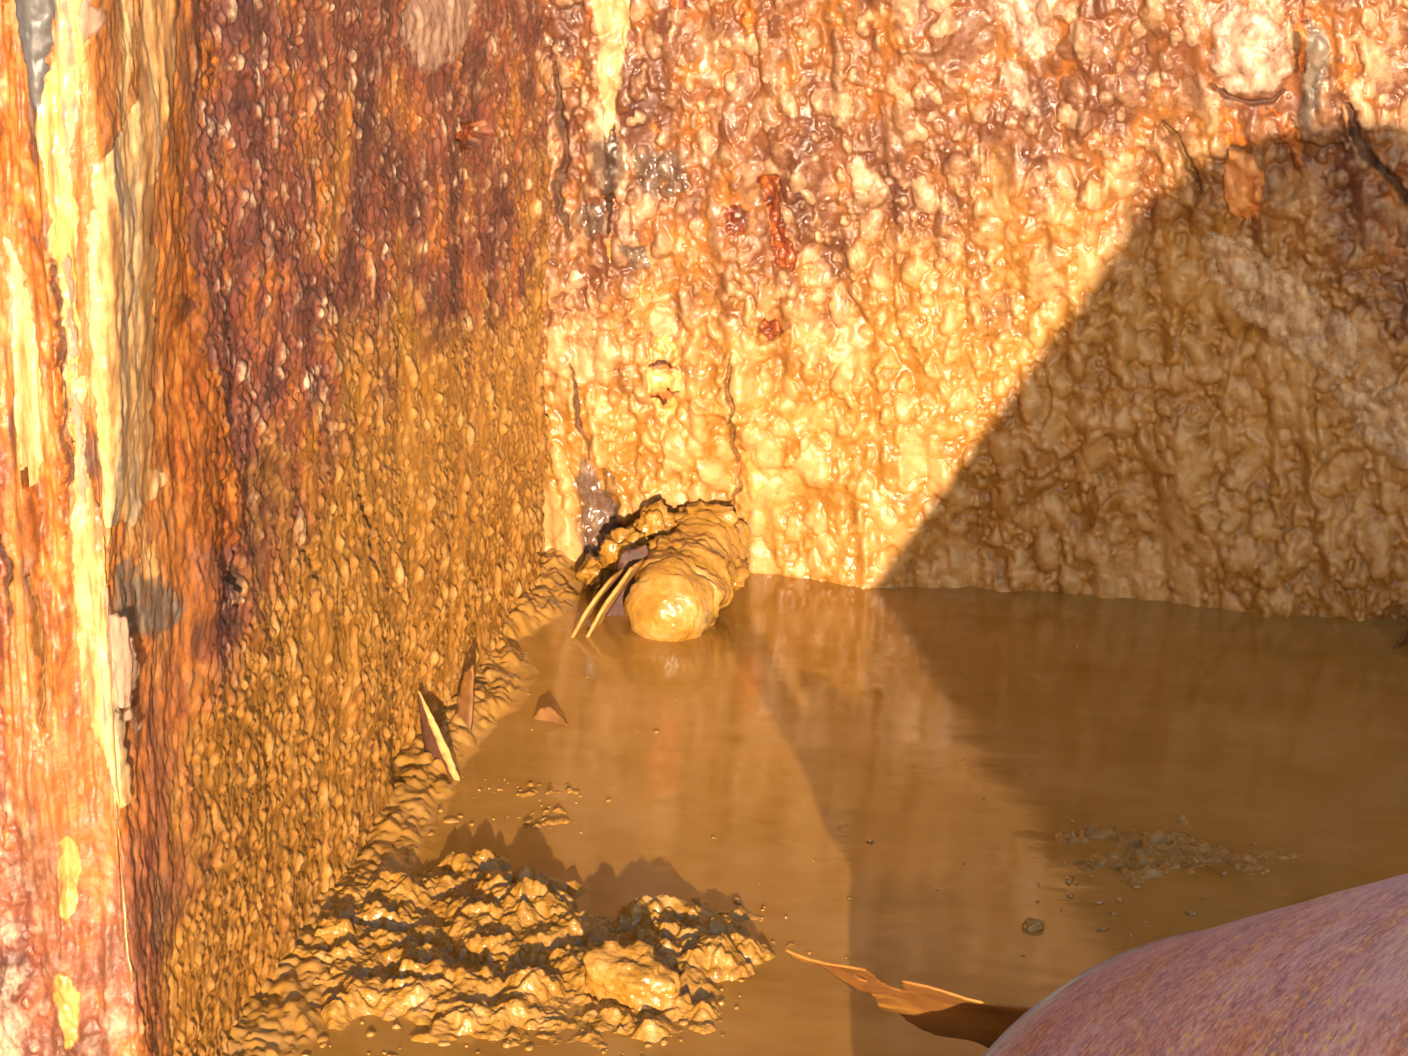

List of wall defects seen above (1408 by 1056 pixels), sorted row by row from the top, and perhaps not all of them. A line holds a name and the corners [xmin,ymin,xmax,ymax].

spalling [14,0,55,112]
corrosion [198,34,220,92]
corrosion [1293,0,1308,71]
corrosion [1218,107,1256,150]
corrosion [1270,107,1305,170]
crack [1346,103,1408,202]
corrosion [0,0,66,426]
corrosion [161,117,242,561]
corrosion [20,457,72,710]
crack [0,535,50,736]
corrosion [57,836,82,926]
corrosion [53,973,81,1049]